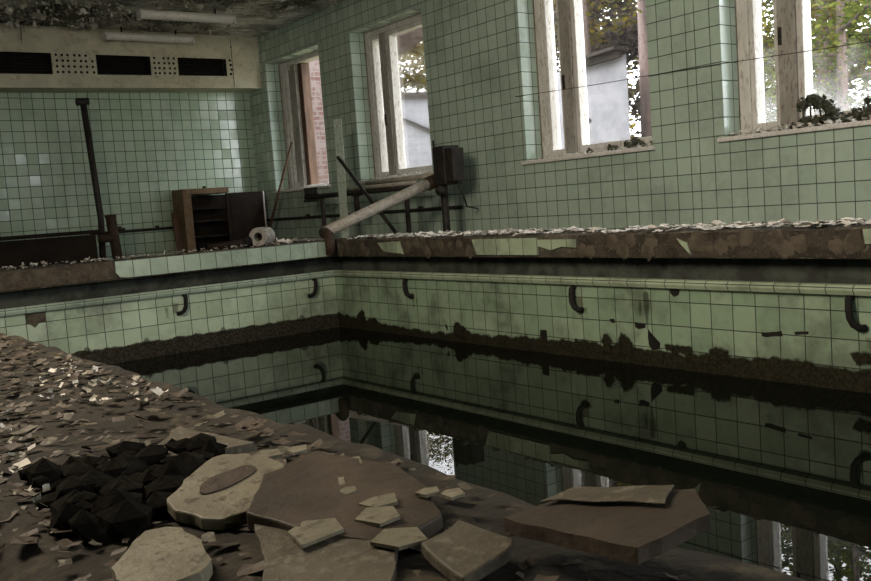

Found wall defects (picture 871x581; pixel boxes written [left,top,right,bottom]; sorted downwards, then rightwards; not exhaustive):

peeling [0,0,337,35]
peeling [26,312,46,328]
spalling [634,322,660,350]
spalling [111,426,711,581]